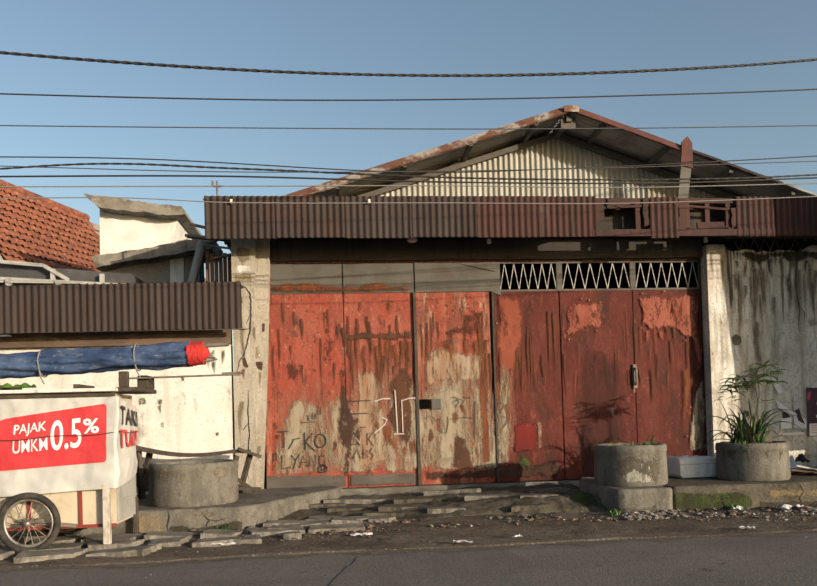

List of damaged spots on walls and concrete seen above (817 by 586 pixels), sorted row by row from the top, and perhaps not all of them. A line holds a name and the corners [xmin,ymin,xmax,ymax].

rust [242,303,304,386]
rust [272,283,408,292]
rust [312,310,416,476]
peeling [275,340,514,475]
rust [427,309,490,463]
rust [453,436,472,469]
peeling [564,298,609,340]
rust [683,297,702,416]
leakage [711,247,817,397]